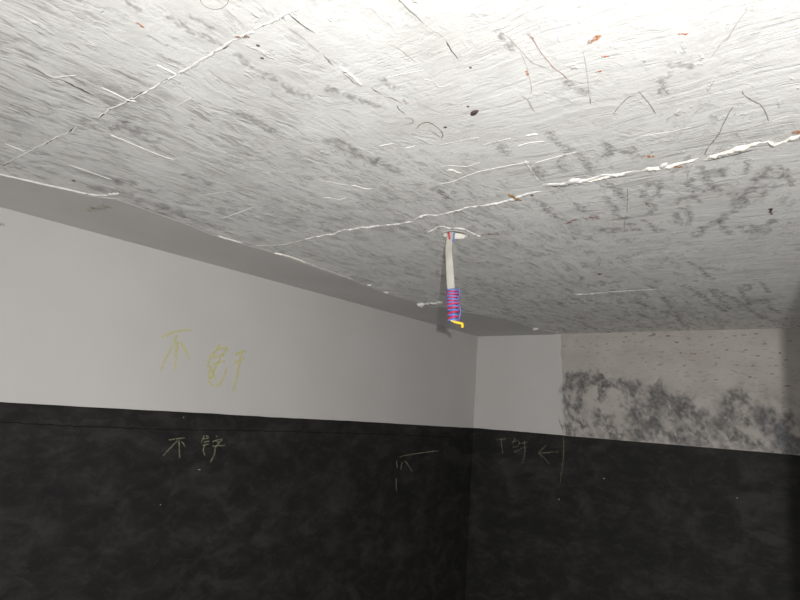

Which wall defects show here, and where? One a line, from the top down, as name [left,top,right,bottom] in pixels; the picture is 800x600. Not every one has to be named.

crack [25,7,403,119]
crack [3,127,77,166]
crack [255,91,800,246]
leakage [562,373,709,446]
leakage [714,392,800,454]